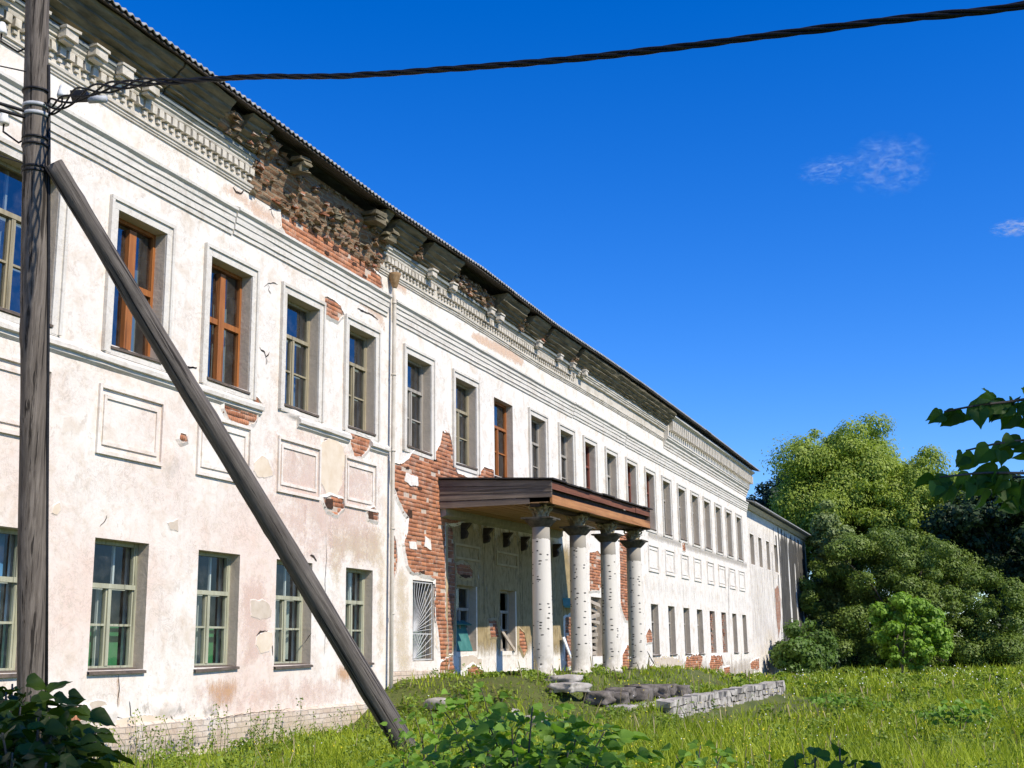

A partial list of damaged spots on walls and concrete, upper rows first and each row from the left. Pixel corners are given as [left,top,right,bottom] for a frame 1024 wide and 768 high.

spalling [216,110,389,290]
flaking render [322,293,345,325]
flaking render [220,387,263,431]
peeling [320,428,372,519]
flaking render [365,505,379,525]
flaking render [388,428,495,677]
flaking render [588,548,601,594]
peeling [645,627,730,675]